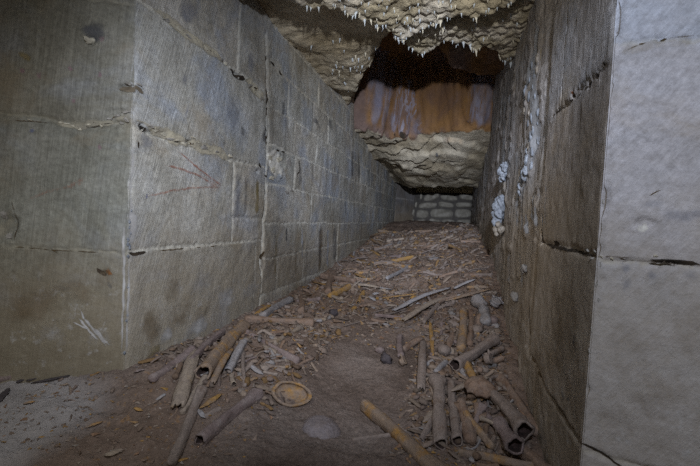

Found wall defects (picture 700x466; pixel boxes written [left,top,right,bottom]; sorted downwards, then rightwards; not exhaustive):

crack [554,62,605,115]
crack [16,119,114,131]
damp [497,16,541,233]
damp [491,194,505,237]
crack [651,255,700,265]